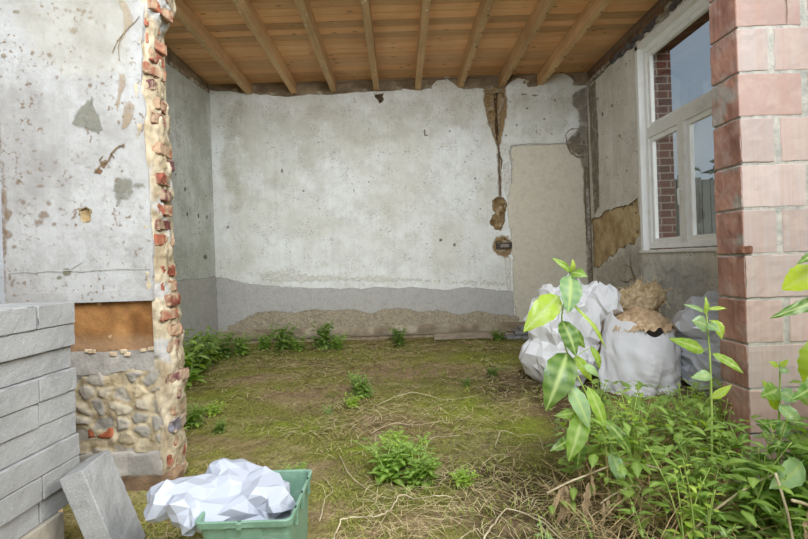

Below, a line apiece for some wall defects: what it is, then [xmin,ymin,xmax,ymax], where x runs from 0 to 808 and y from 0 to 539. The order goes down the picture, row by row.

spalling [69,0,538,491]
spalling [591,198,640,268]